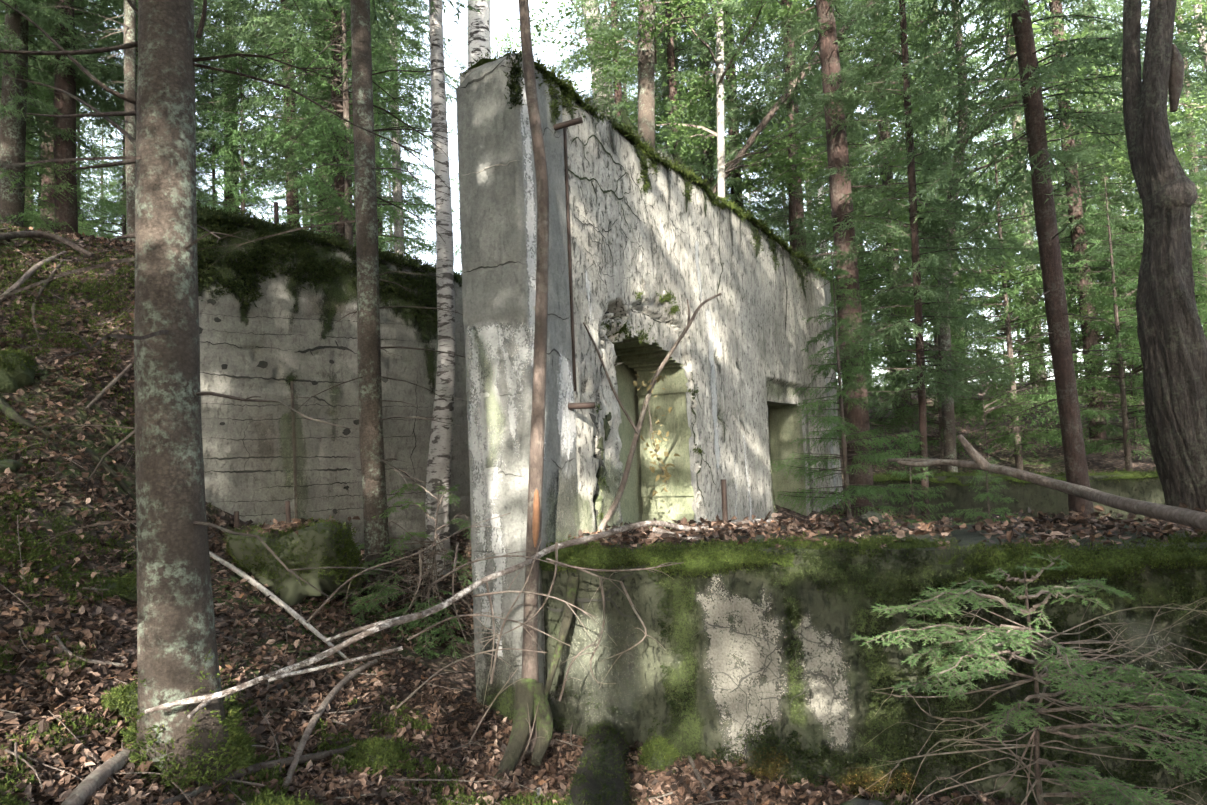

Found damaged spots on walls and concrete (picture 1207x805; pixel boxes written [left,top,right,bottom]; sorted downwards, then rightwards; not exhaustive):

leakage [228,277,251,325]
leakage [286,267,302,313]
leakage [318,294,338,339]
crack [464,261,522,273]
crack [530,122,776,341]
crack [551,413,606,519]
leakage [664,575,710,762]
leakage [784,594,807,726]